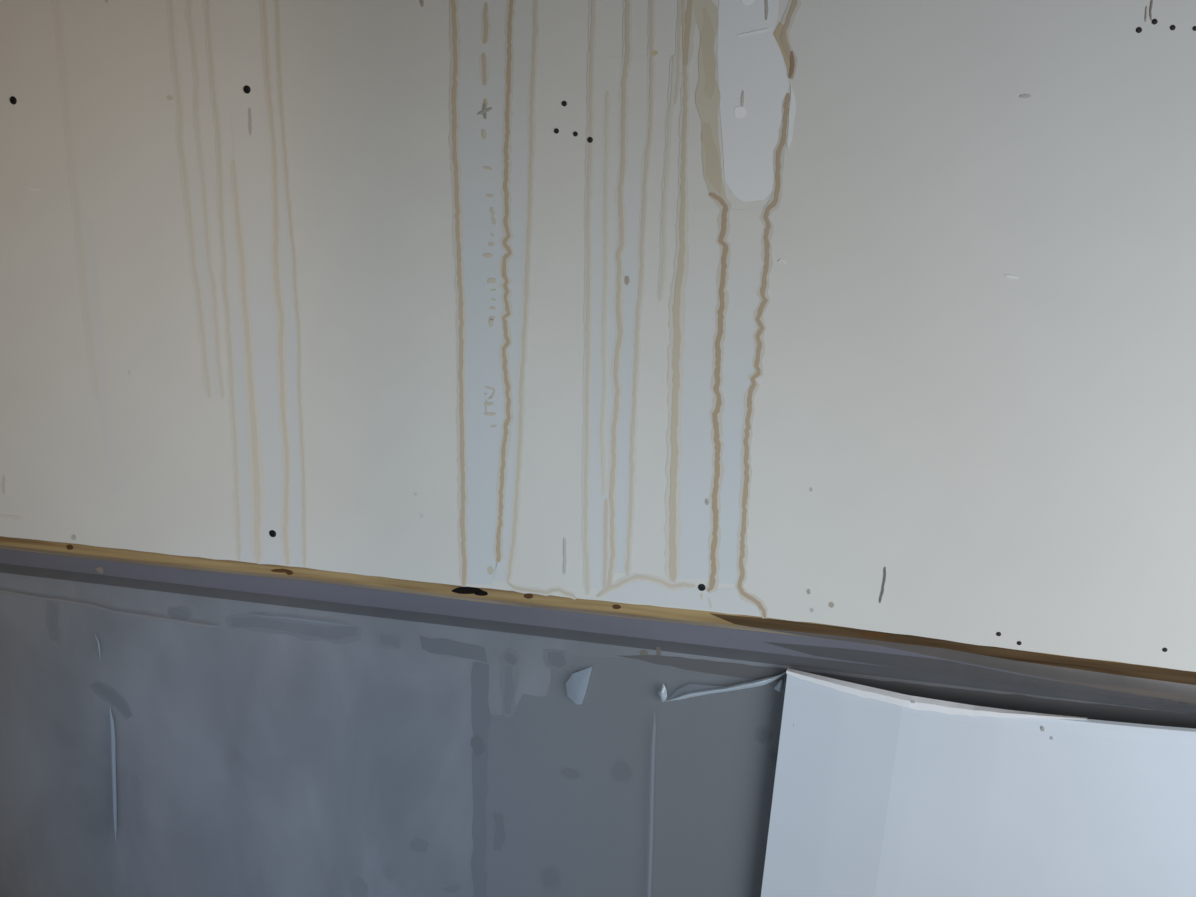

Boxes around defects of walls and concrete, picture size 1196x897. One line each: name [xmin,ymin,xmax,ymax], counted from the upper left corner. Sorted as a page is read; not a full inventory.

damp [167,0,308,567]
damp [449,0,802,618]